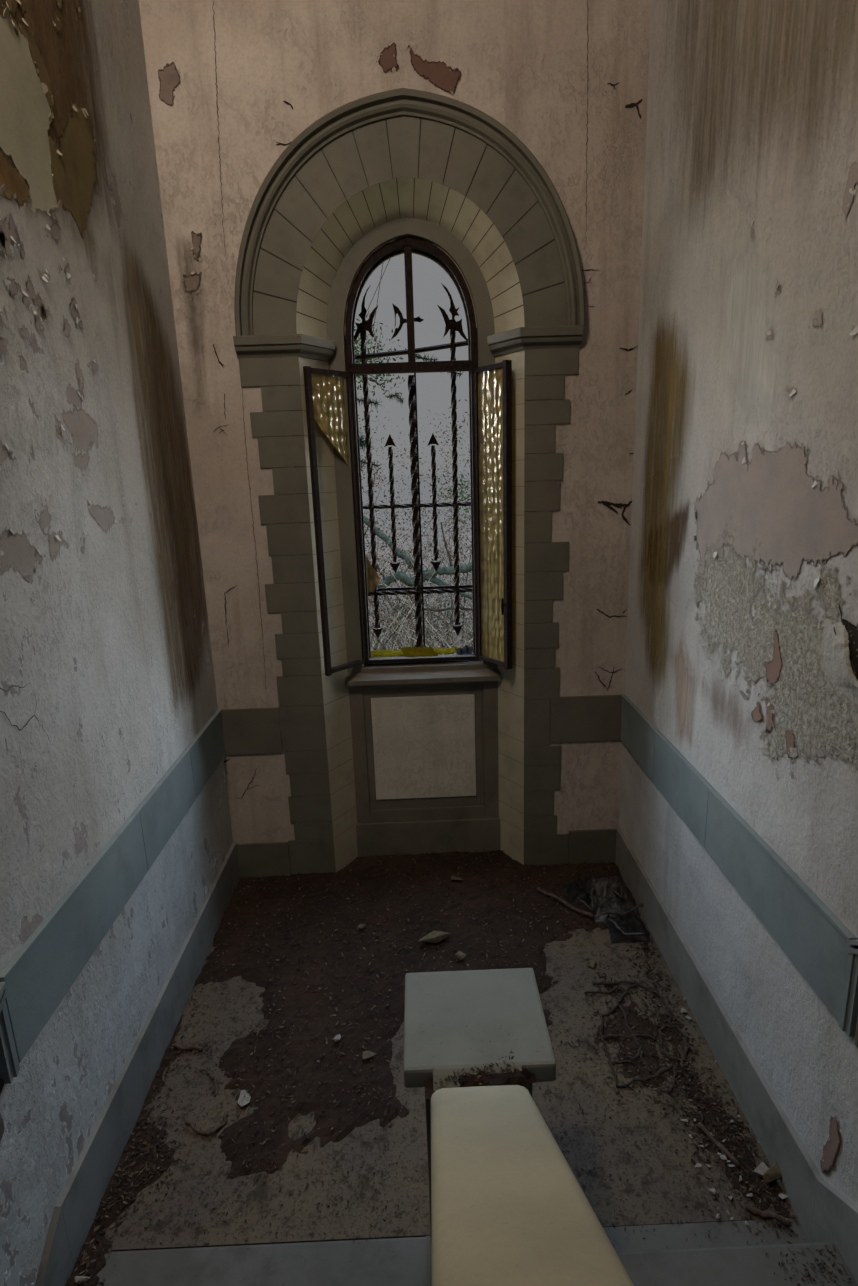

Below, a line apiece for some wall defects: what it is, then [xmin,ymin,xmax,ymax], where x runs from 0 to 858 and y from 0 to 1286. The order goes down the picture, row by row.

damp [0,0,105,183]
peeling [158,62,181,105]
peeling [376,43,462,95]
damp [686,0,847,175]
peeling [0,0,98,377]
peeling [55,359,99,472]
peeling [0,498,69,583]
flaking render [685,440,858,784]